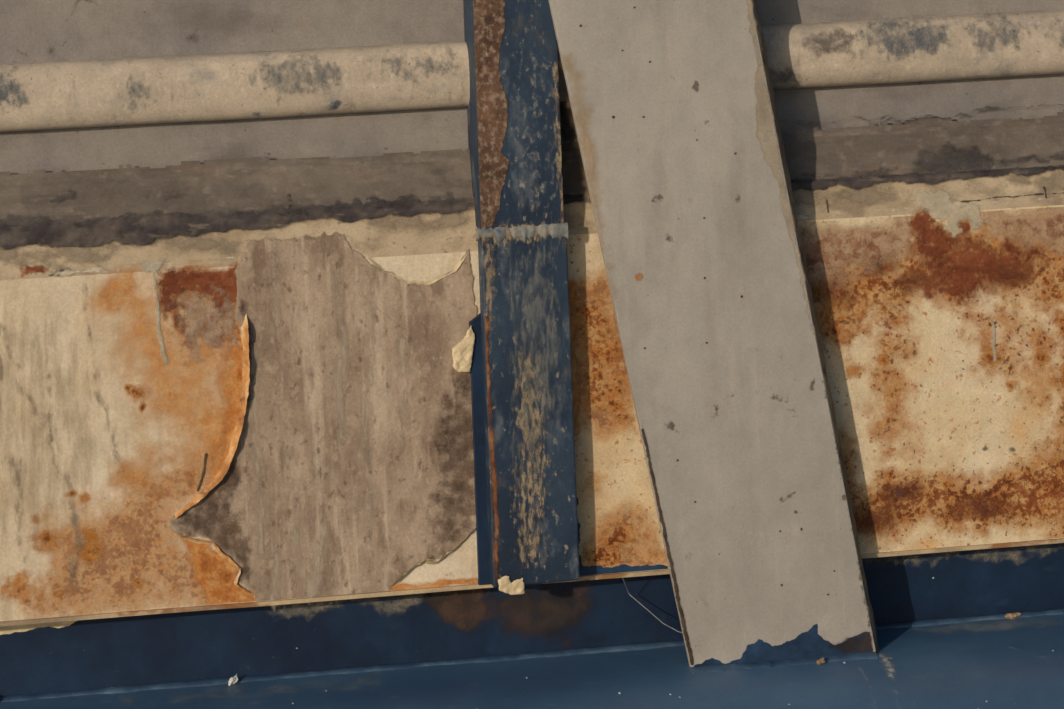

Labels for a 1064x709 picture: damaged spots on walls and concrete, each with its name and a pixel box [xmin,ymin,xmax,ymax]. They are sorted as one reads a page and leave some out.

rust [473,0,510,228]
rust [1,265,253,615]
peeling [170,232,477,606]
peeling [498,576,524,595]
rust [569,272,633,435]
rust [581,506,668,568]
peeling [694,624,873,667]
rust [798,207,1064,549]